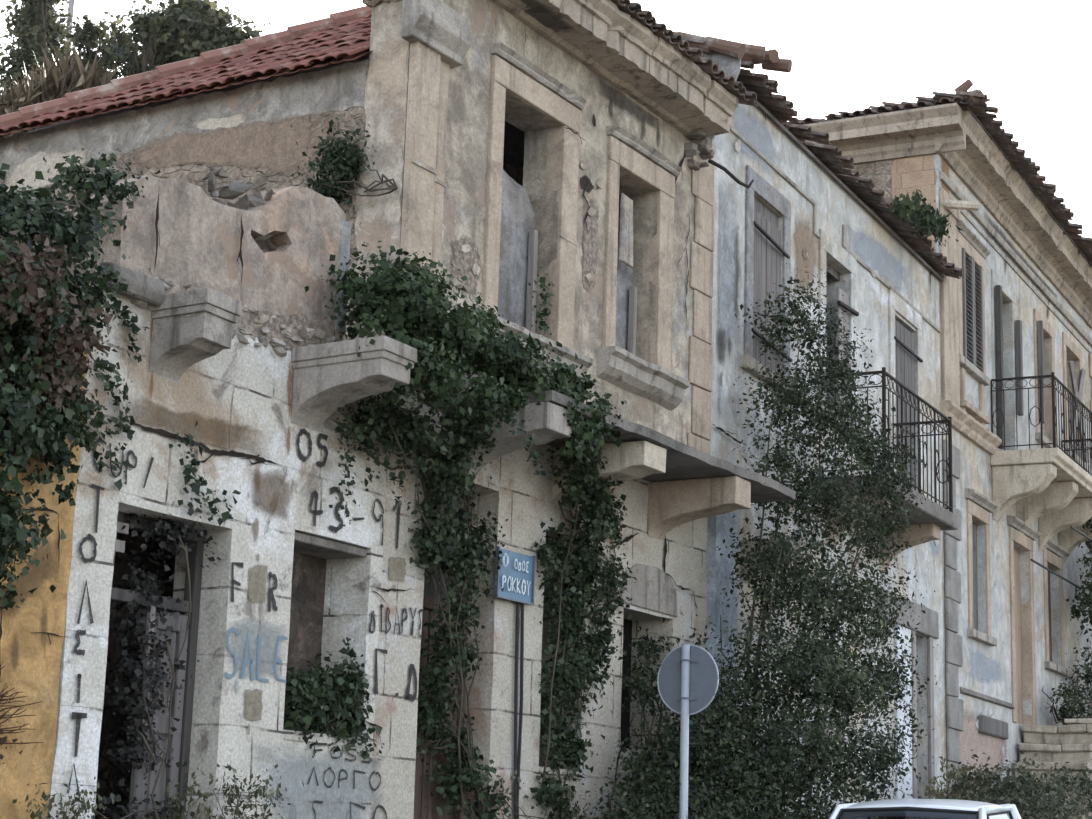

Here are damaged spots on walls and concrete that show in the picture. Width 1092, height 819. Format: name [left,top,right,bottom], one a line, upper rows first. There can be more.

flaking render [133,113,329,172]
crack [153,194,161,266]
crack [236,214,244,282]
flaking render [580,161,605,292]
spalling [233,306,332,350]
crack [133,423,278,465]